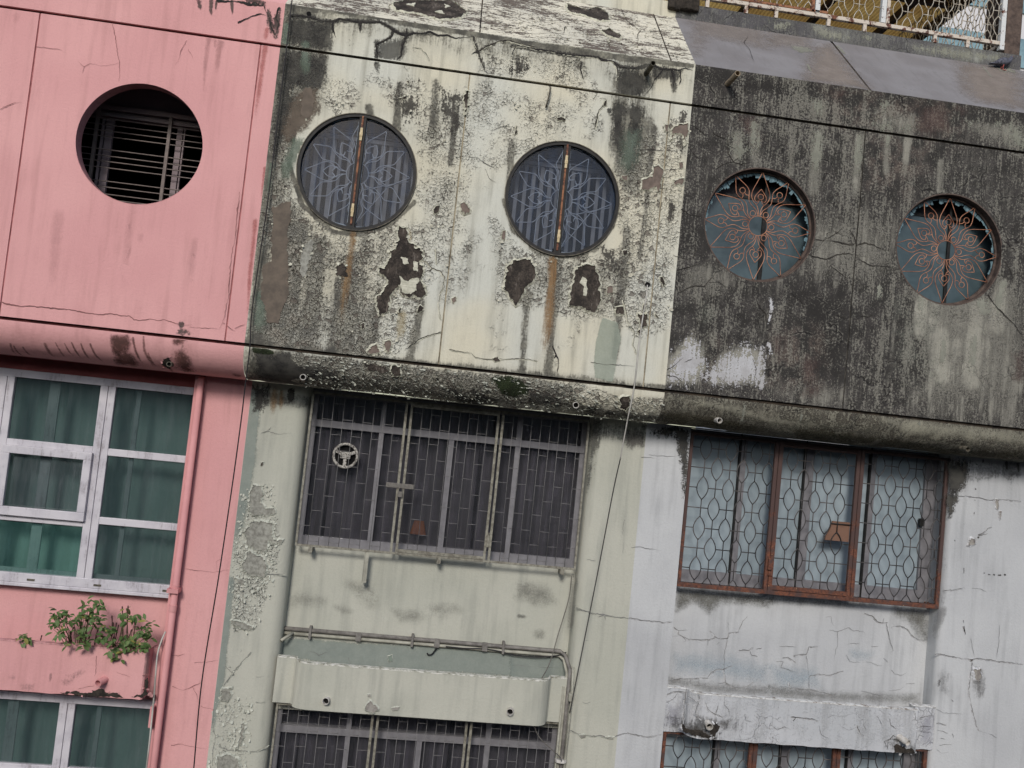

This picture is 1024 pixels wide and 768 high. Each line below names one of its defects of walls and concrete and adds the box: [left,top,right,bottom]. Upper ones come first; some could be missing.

crack [216,0,688,130]
peeling [365,0,685,58]
peeling [631,121,691,241]
water stain [751,121,760,148]
water stain [853,134,864,175]
water stain [959,64,1024,108]
rust [545,168,566,343]
crack [809,227,892,291]
peeling [300,224,673,424]
efflorescence [667,337,773,389]
peeling [228,483,284,635]
crack [570,607,1023,753]